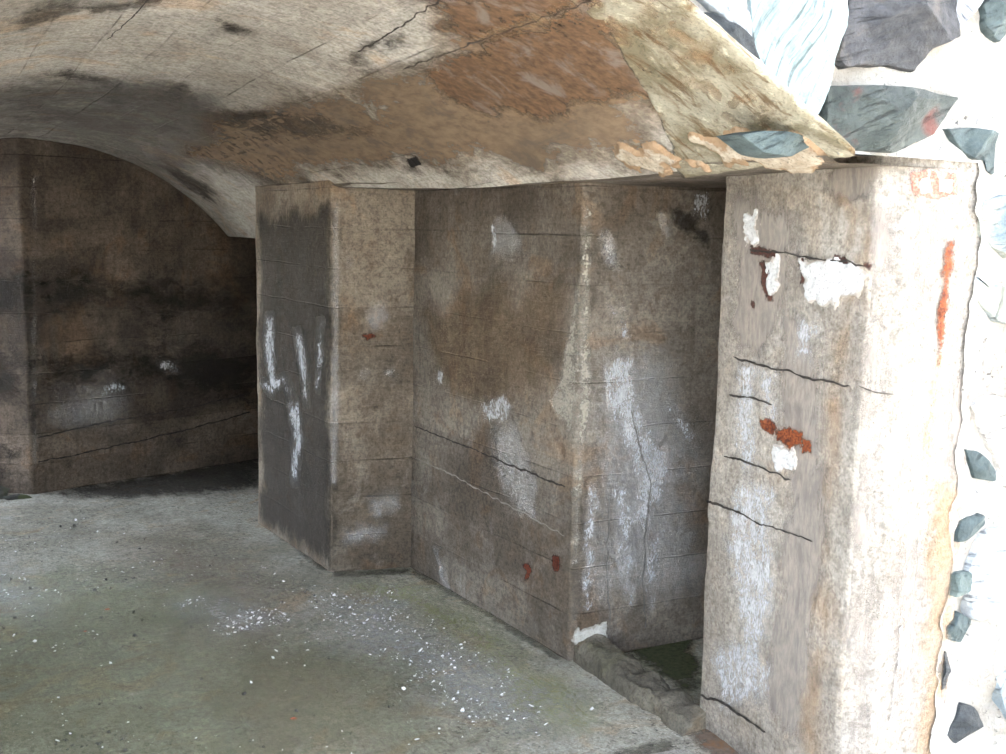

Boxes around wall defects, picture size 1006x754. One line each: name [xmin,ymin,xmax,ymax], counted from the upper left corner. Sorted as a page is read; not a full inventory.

leakage [21,0,78,30]
leakage [91,0,160,14]
leakage [181,0,654,185]
spalling [743,209,761,247]
spalling [765,253,780,296]
spalling [798,256,870,310]
rust [936,240,955,365]
crack [734,357,892,395]
crack [729,394,772,405]
rust [759,418,812,454]
crack [724,456,790,481]
crack [706,500,813,542]